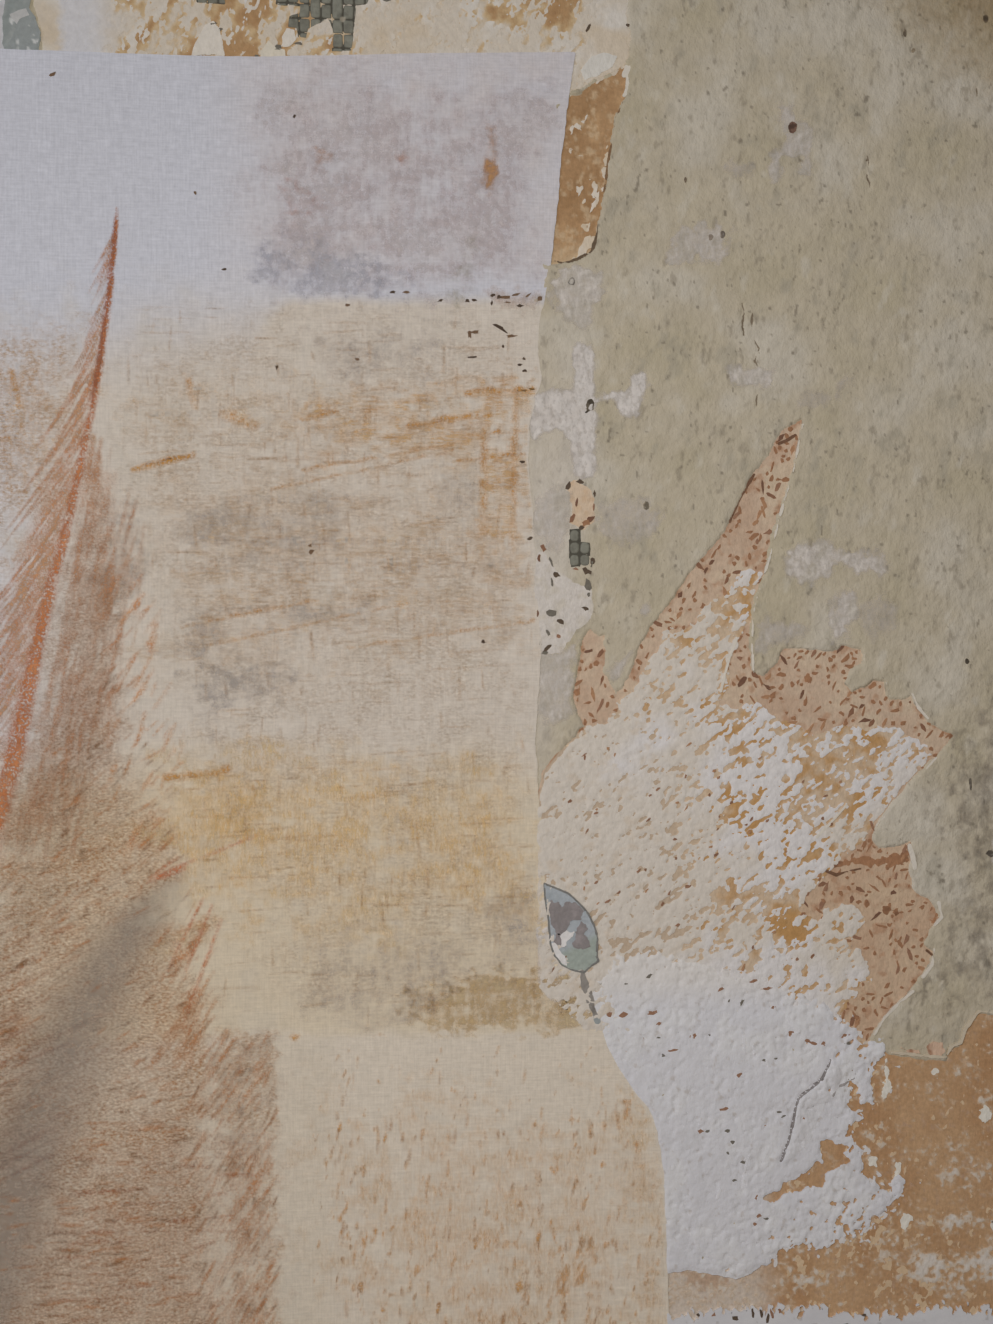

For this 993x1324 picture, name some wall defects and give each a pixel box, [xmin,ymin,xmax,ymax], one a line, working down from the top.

peeling [2,0,631,285]
rust [0,218,118,838]
rust [23,939,204,1226]
peeling [527,420,993,1321]